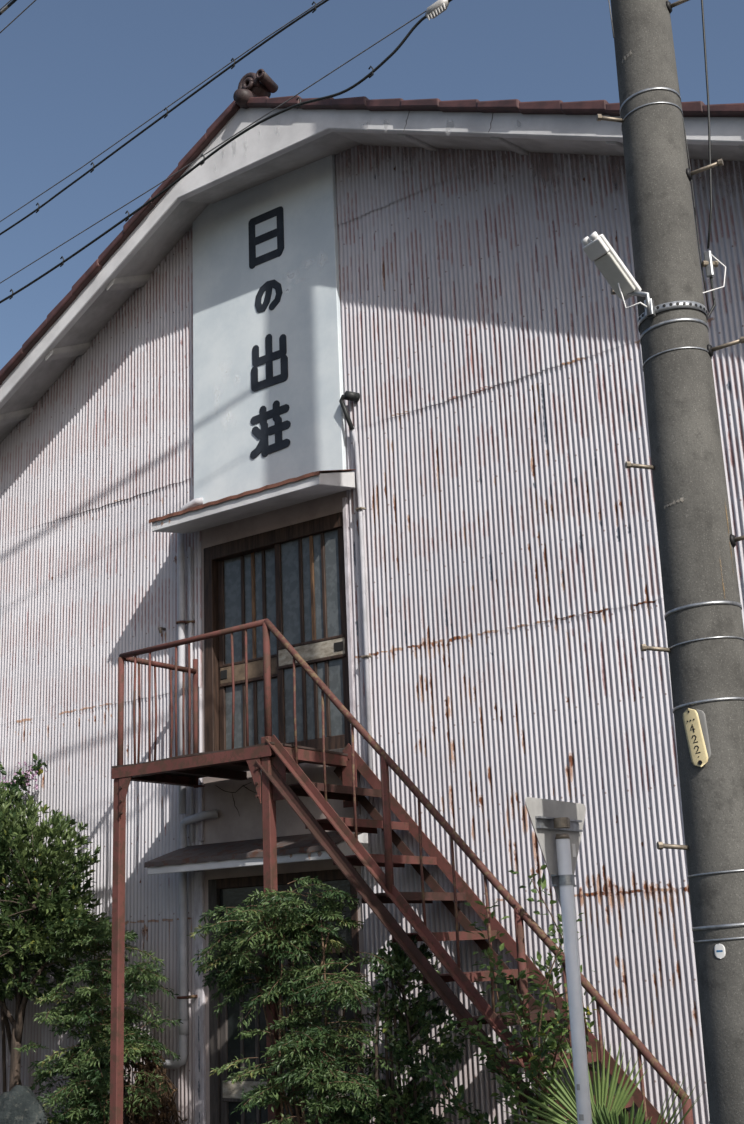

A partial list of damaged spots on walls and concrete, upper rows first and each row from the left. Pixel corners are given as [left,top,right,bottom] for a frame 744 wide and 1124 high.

rust [15,703,113,747]
rust [355,440,608,910]
rust [631,585,655,624]
rust [574,865,690,1032]